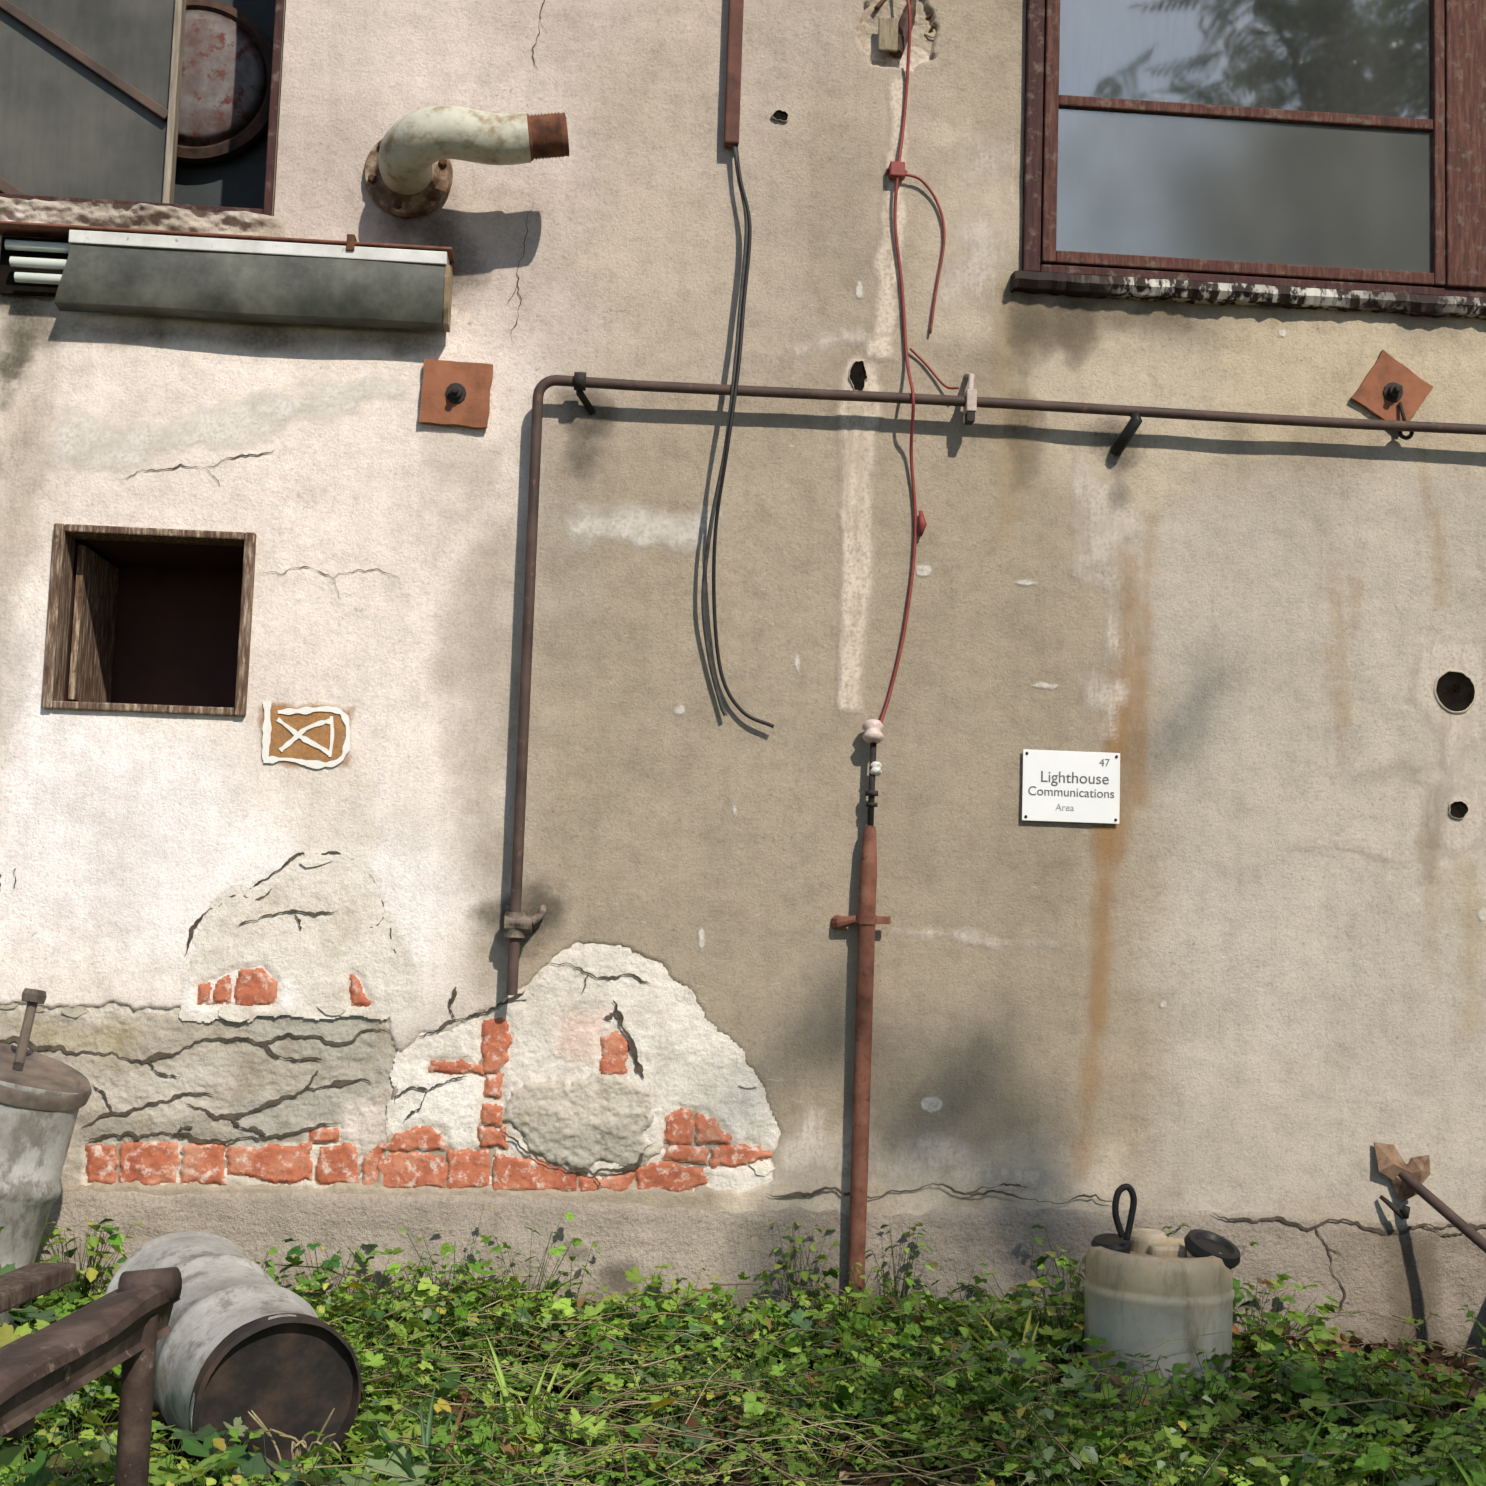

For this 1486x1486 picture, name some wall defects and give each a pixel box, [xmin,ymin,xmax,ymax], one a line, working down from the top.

flaking render [858,0,938,71]
crack [508,208,533,343]
crack [0,987,525,1144]
flaking render [0,850,781,1193]
crack [549,963,650,1079]
crack [767,1183,1128,1207]
crack [1213,1213,1486,1314]